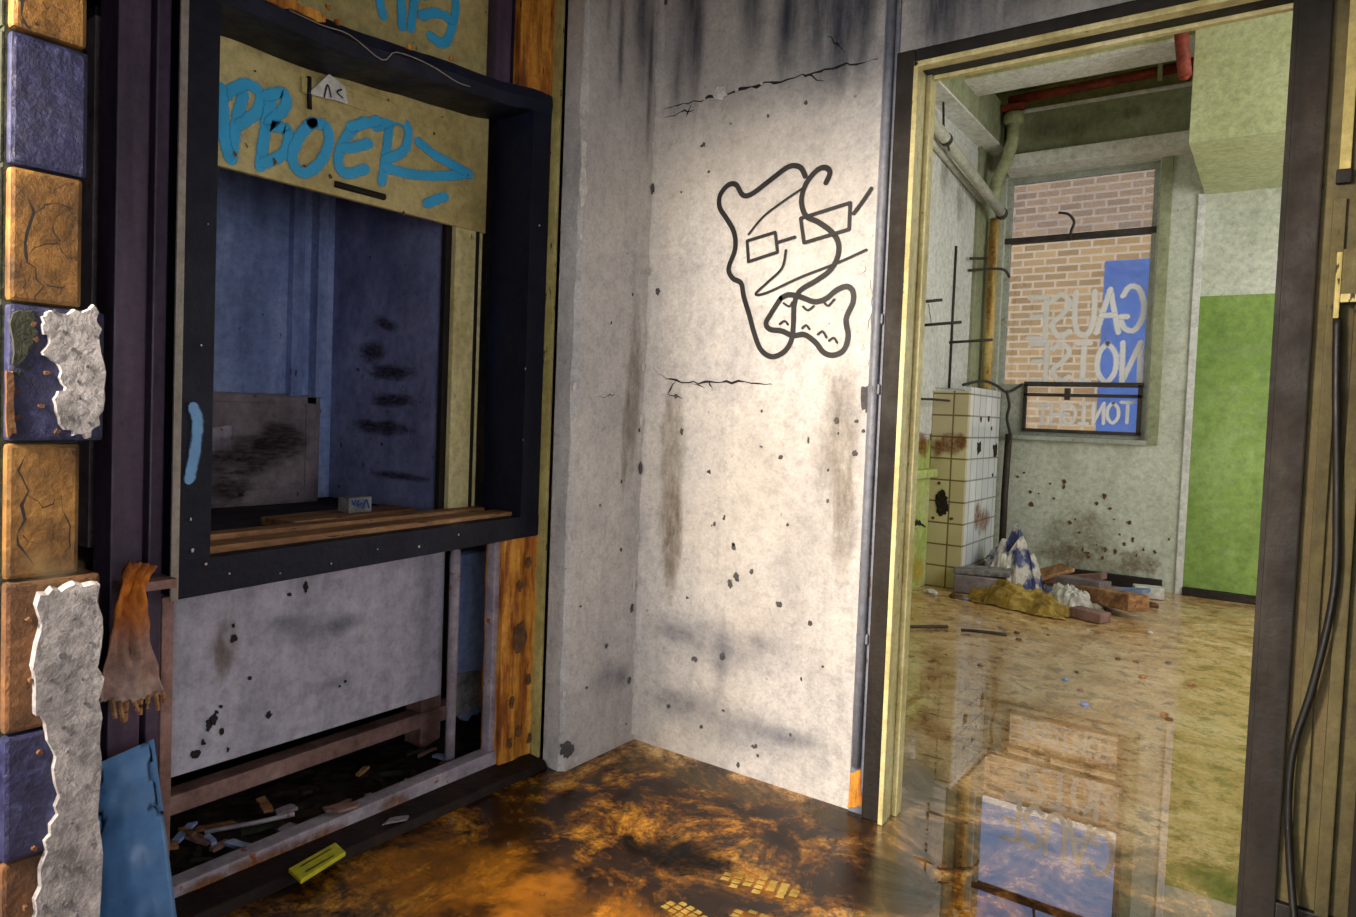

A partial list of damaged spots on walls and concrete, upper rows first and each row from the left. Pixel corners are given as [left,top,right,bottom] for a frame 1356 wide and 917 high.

crack [664,36,878,118]
flaking render [5,304,106,439]
crack [655,370,771,399]
corrosion [919,434,966,455]
spalling [931,481,953,520]
flaking render [22,580,105,917]
leakage [624,838,724,871]